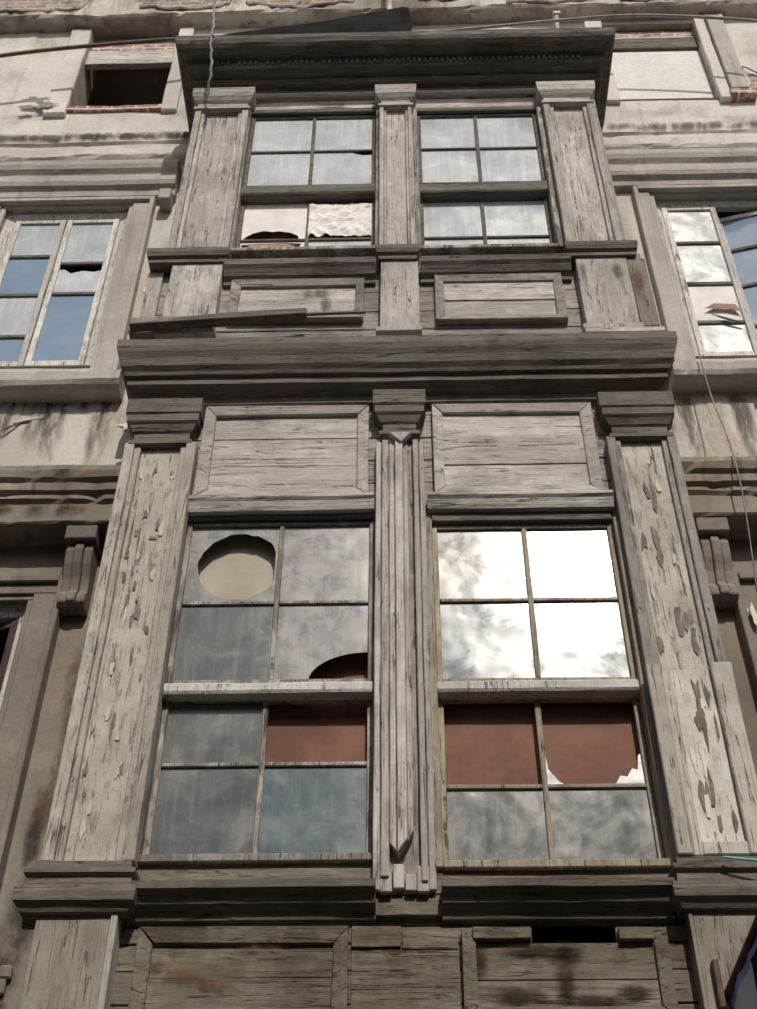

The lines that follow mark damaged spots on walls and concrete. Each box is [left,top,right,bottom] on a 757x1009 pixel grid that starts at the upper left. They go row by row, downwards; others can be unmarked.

flaking render [0,0,89,13]
flaking render [139,0,231,10]
flaking render [246,0,356,8]
flaking render [729,68,757,102]
damp [0,402,64,433]
damp [82,401,122,444]
damp [674,391,752,457]
peeling [643,442,662,512]
peeling [641,526,676,568]
peeling [122,509,164,634]
peeling [650,581,700,655]
peeling [689,679,738,832]